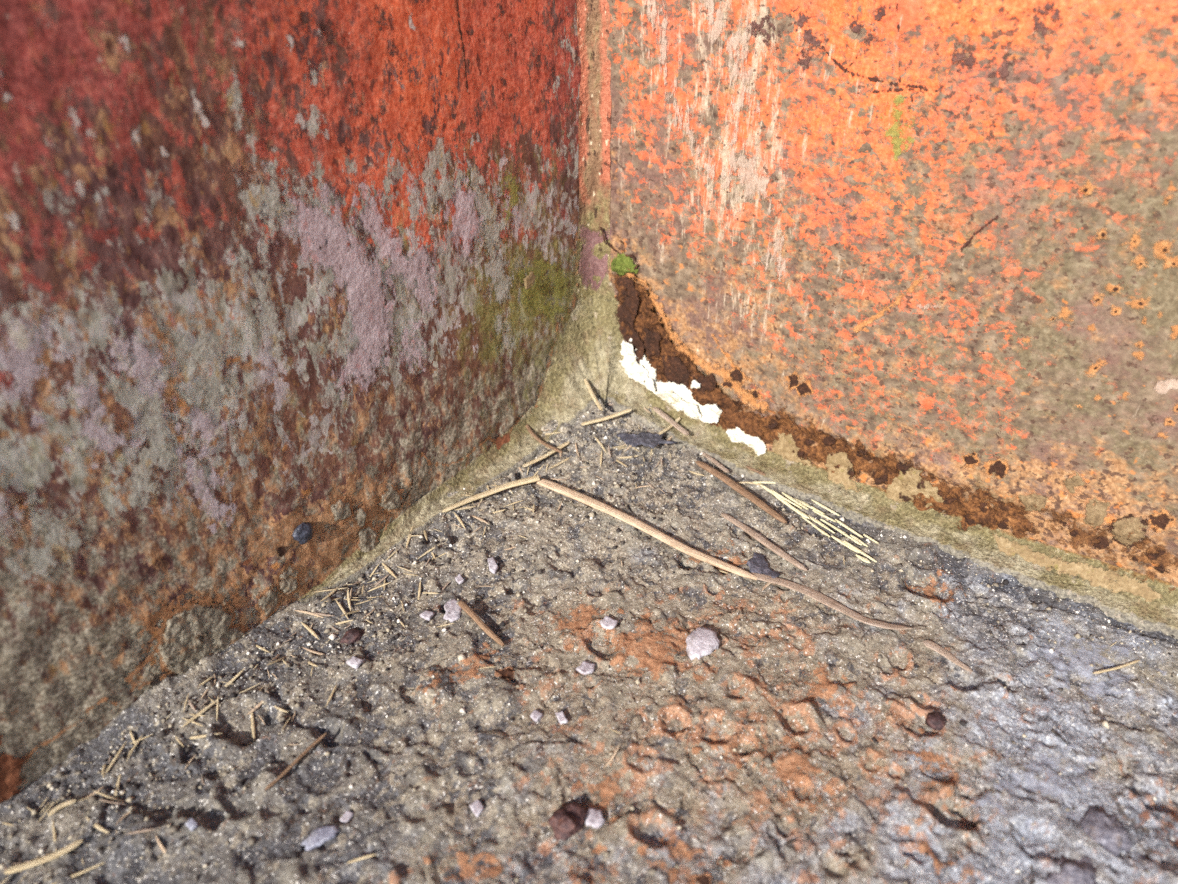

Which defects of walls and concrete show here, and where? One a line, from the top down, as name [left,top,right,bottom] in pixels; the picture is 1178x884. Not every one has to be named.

rust [1122,234,1178,270]
rust [1050,307,1073,321]
rust [1094,283,1162,324]
rust [1086,358,1106,375]
rust [744,400,1178,582]
rust [124,477,407,675]
rust [710,540,747,595]
rust [905,566,966,618]
rust [552,592,703,689]
rust [414,642,499,705]
rust [0,735,31,804]